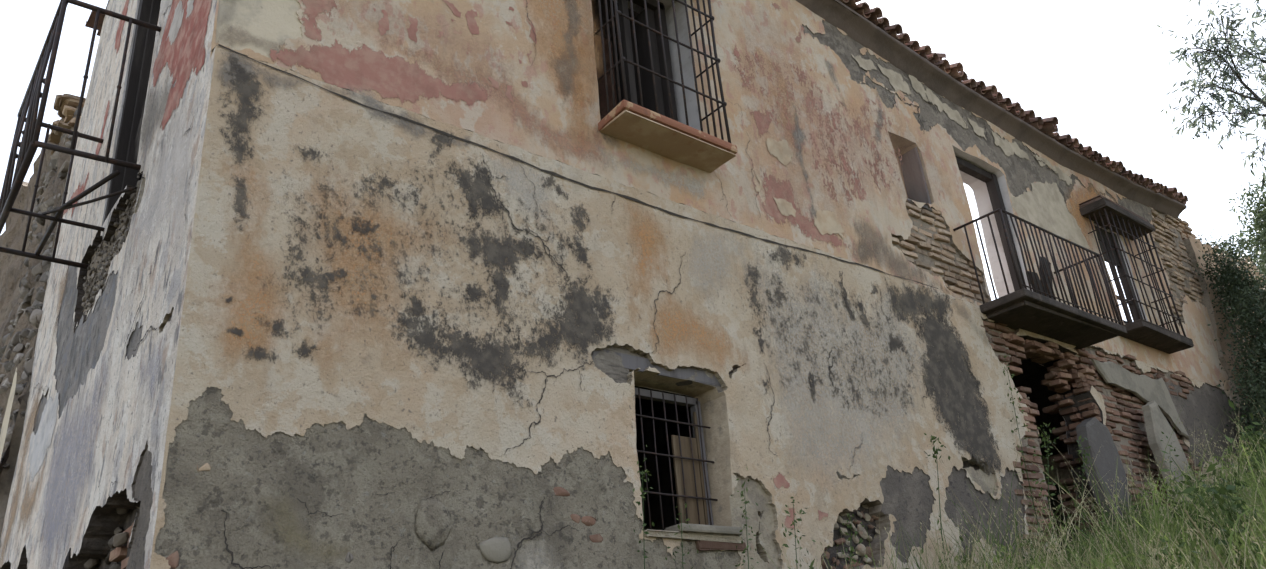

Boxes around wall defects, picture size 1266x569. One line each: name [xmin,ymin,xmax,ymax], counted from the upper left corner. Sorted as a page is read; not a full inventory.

spalling [29,171,145,482]
peeling [153,0,528,131]
water stain [244,92,625,408]
spalling [126,387,796,569]
crack [505,361,593,453]
crack [218,44,938,321]
crack [652,253,686,353]
water stain [742,223,1001,474]
spalling [731,20,1205,327]
spalling [880,191,1259,564]